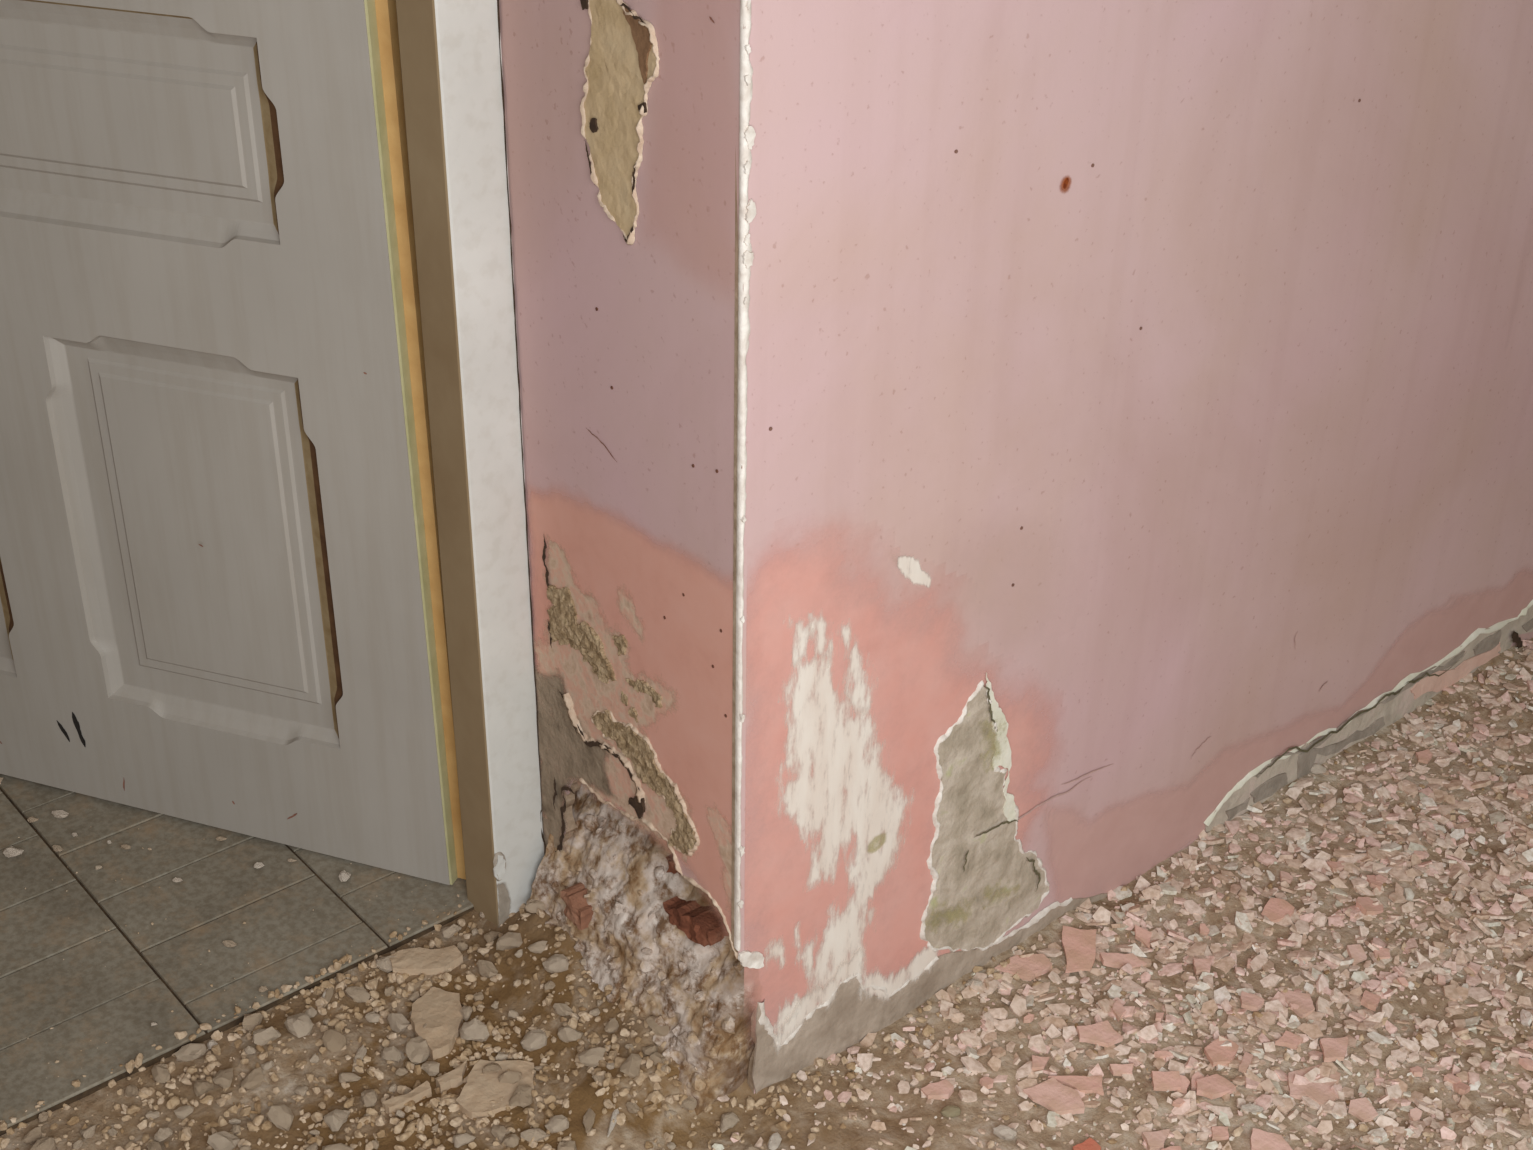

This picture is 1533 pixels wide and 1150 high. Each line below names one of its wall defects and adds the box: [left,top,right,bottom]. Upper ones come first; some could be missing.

rust [1061,177,1071,192]
spalling [0,0,1128,1150]
leakage [529,494,1533,1031]
spalling [1204,600,1533,833]